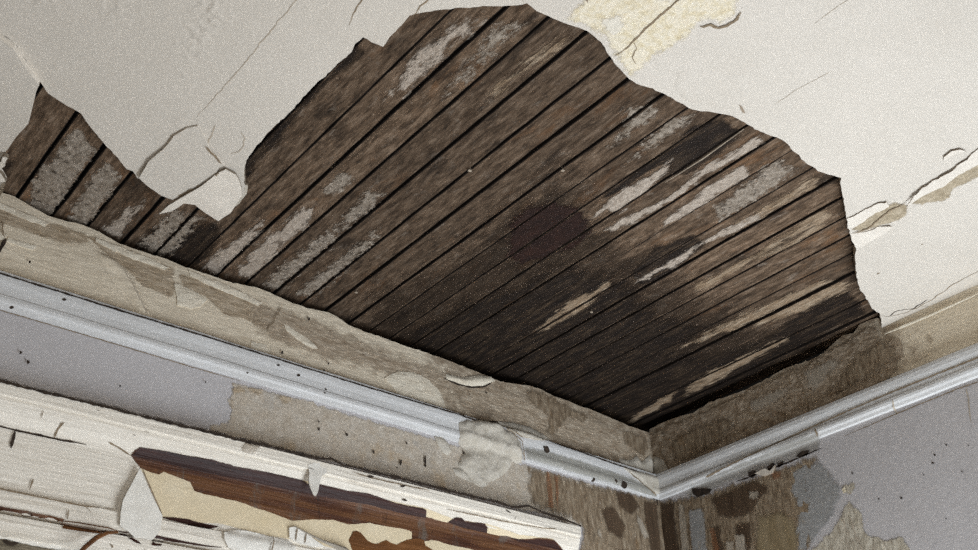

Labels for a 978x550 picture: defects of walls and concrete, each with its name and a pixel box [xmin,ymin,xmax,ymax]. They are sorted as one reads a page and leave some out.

crack [197,0,297,117]
crack [614,0,679,64]
flaking render [0,152,9,182]
flaking render [139,125,248,221]
damp [135,190,386,299]
damp [403,106,865,460]
flaking render [847,149,978,249]
flaking render [0,209,978,497]
peeling [0,536,62,550]
flaking render [60,383,606,550]
flaking render [736,448,910,550]